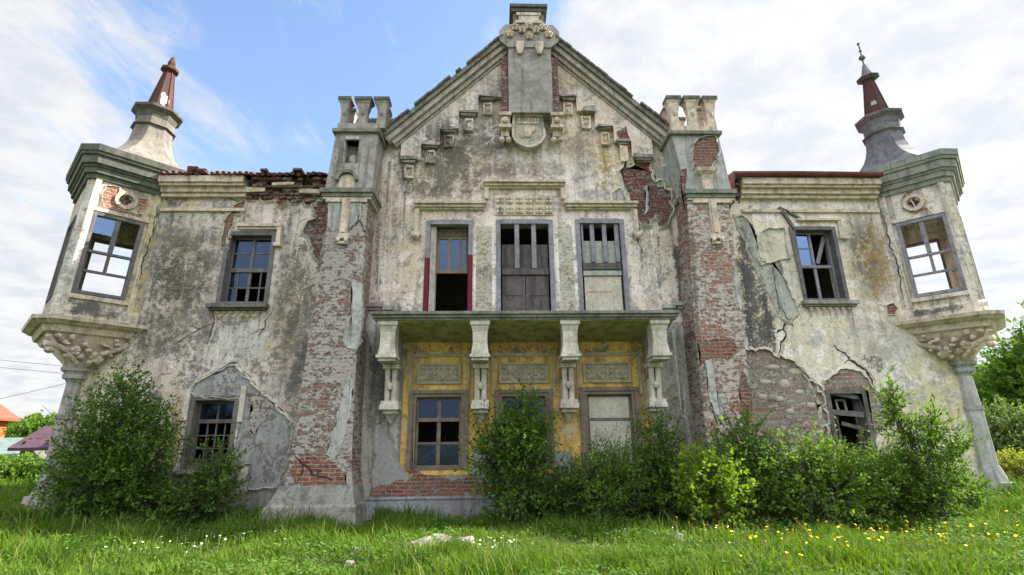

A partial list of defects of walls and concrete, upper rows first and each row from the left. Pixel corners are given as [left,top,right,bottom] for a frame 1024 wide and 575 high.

spalling [98,185,149,219]
spalling [219,176,328,268]
spalling [610,126,687,231]
water stain [736,226,776,354]
crack [732,214,823,389]
water stain [795,218,896,305]
crack [883,215,903,296]
crack [177,308,278,388]
peeling [189,364,346,492]
spalling [368,417,518,497]
spalling [697,336,894,448]
crack [834,344,882,395]